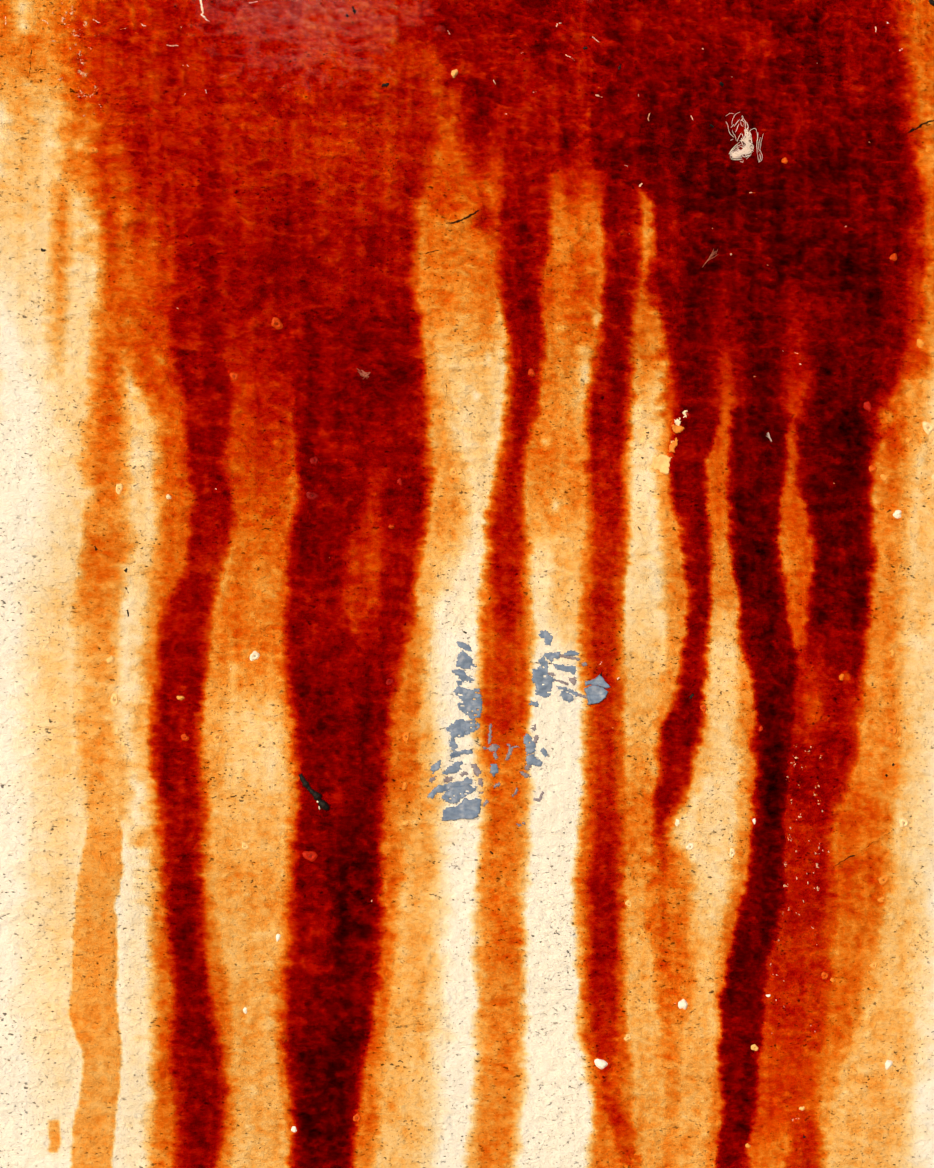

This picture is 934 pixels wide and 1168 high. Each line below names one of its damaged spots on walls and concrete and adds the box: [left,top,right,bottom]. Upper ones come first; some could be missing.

rust [92,303,126,484]
rust [354,336,370,353]
rust [353,355,424,392]
rust [399,312,426,355]
rust [86,518,126,596]
peeling [529,630,611,707]
peeling [427,641,548,821]
rust [478,1125,512,1168]